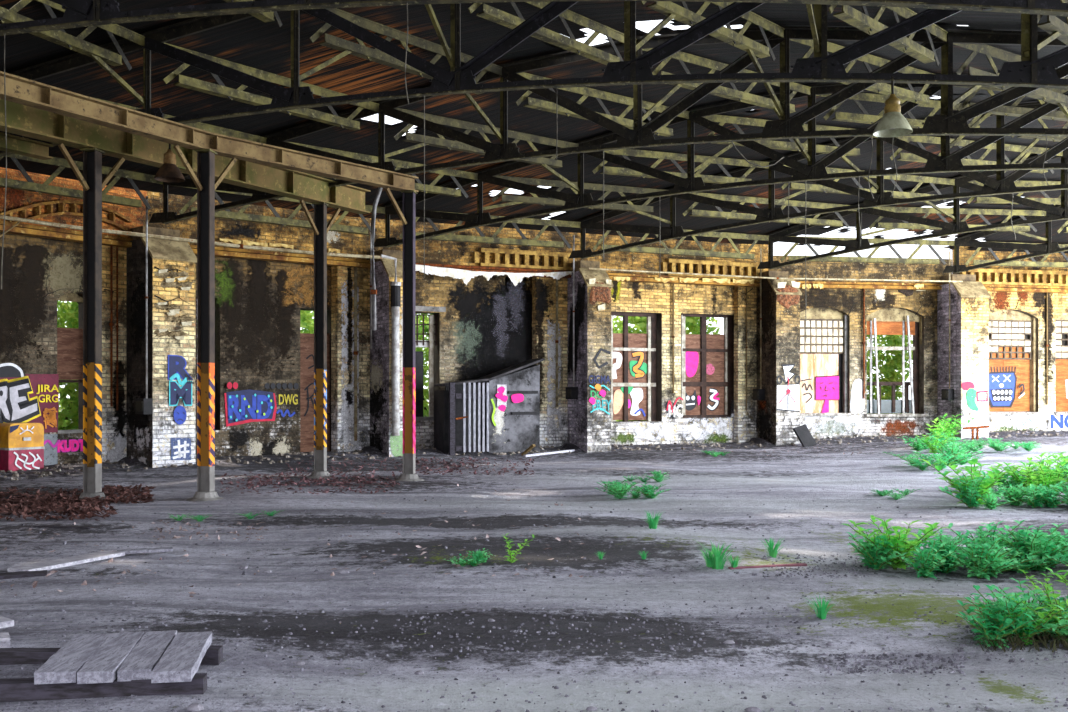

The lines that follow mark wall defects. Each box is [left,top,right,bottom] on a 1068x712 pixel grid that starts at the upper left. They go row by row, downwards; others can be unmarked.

damp [0,243,50,365]
damp [218,258,296,379]
flaking render [284,265,314,306]
peeling [327,269,359,452]
peeling [416,265,573,286]